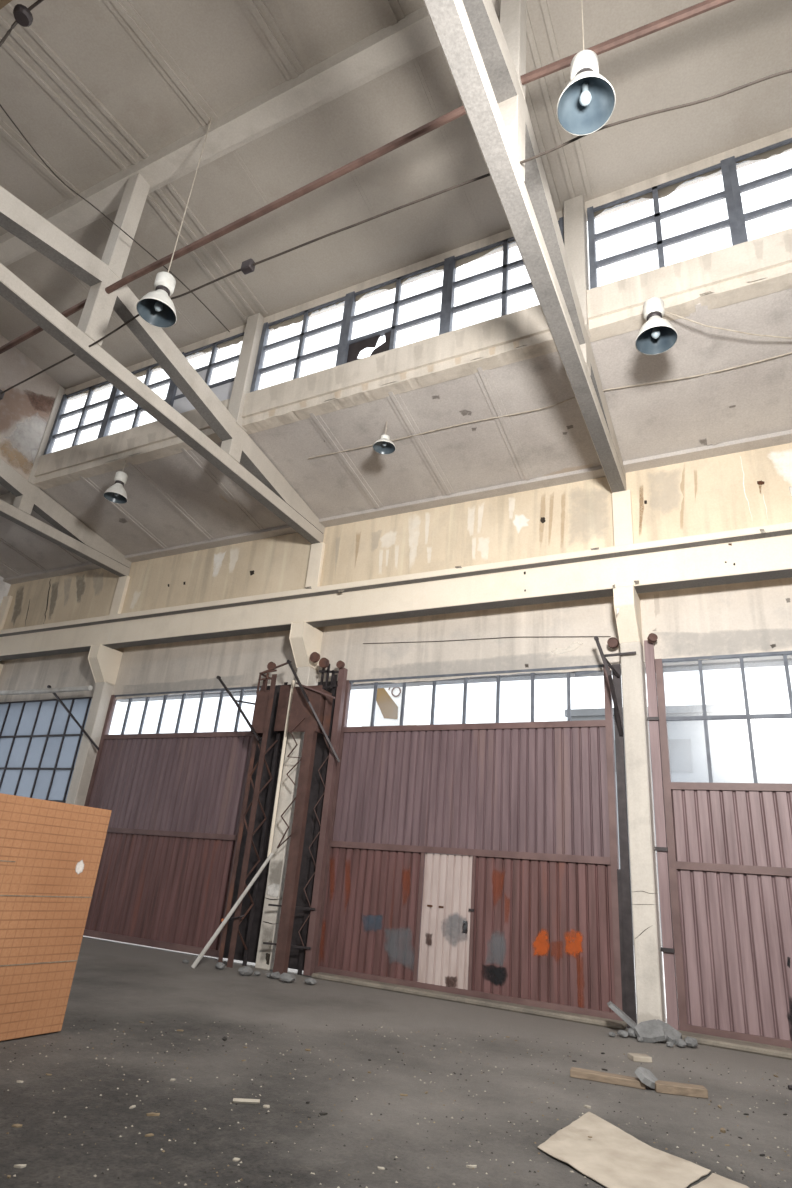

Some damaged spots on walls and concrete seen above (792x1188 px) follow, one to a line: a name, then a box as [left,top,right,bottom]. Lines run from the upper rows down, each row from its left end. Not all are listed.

peeling [0,383,110,473]
leakage [467,500,490,562]
leakage [508,484,612,552]
leakage [639,462,698,532]
leakage [0,576,25,628]
leakage [48,571,105,621]